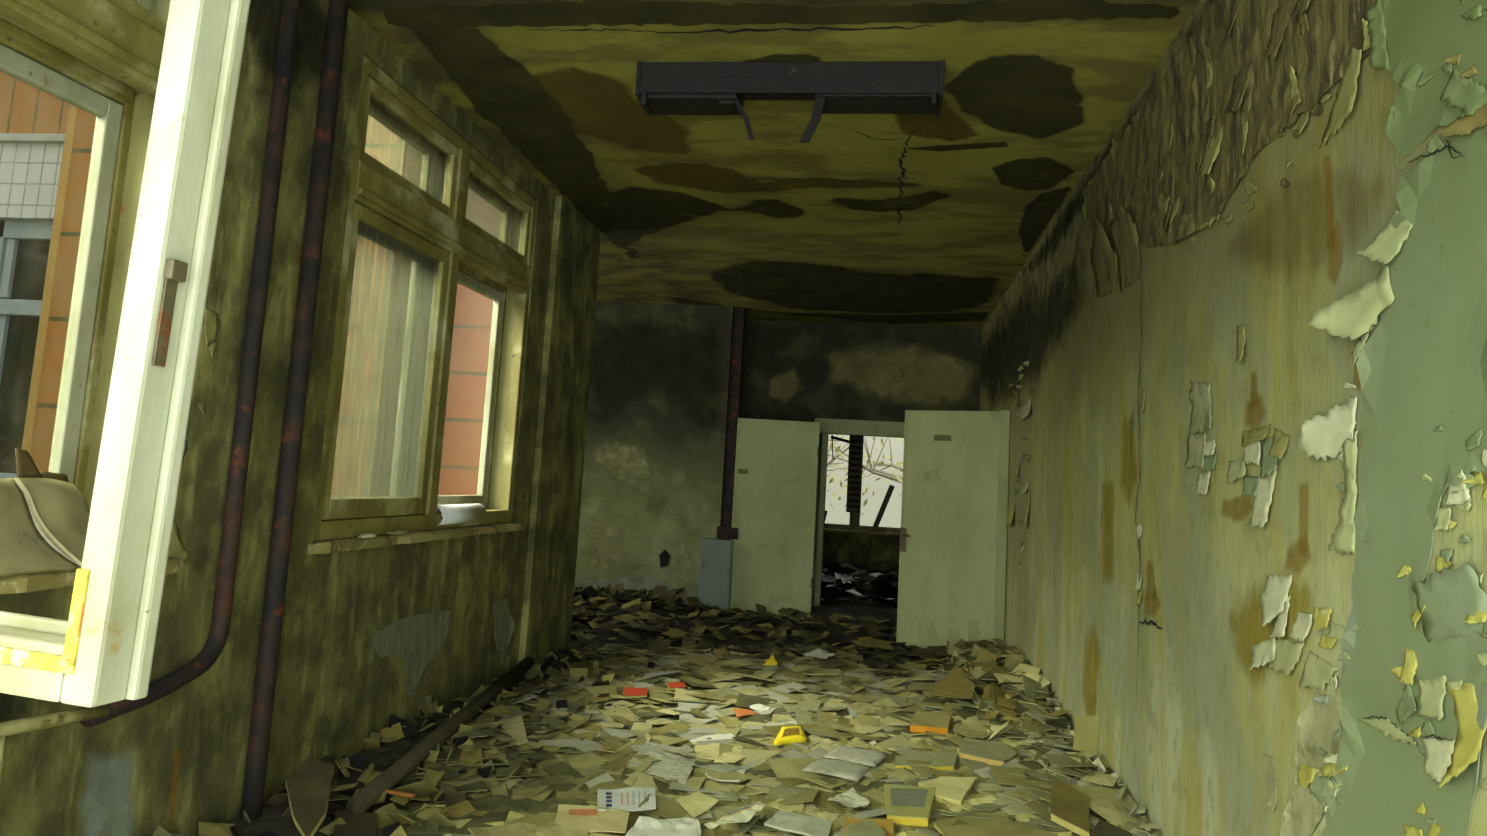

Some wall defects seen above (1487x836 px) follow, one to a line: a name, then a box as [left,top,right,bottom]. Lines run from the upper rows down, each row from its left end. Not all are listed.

peeling [1082,0,1487,836]